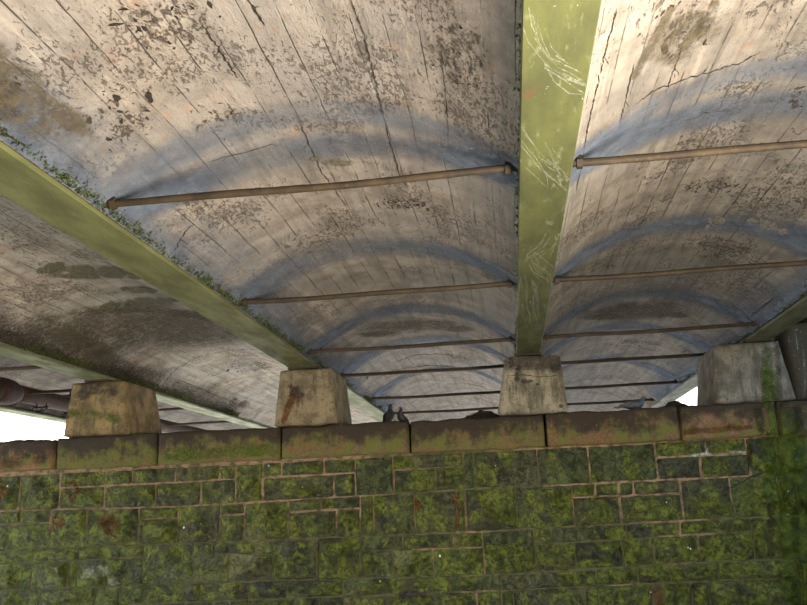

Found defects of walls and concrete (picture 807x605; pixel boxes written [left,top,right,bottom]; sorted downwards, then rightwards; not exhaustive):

leakage [632,7,713,79]
crack [620,41,757,125]
leakage [0,46,237,285]
leakage [405,117,519,188]
leakage [83,303,207,319]
leakage [219,261,807,390]
leakage [0,402,79,417]
leakage [0,315,240,414]
corrosion [281,393,300,423]
leakage [363,375,408,412]
leakage [626,360,698,399]
leakage [759,366,807,605]